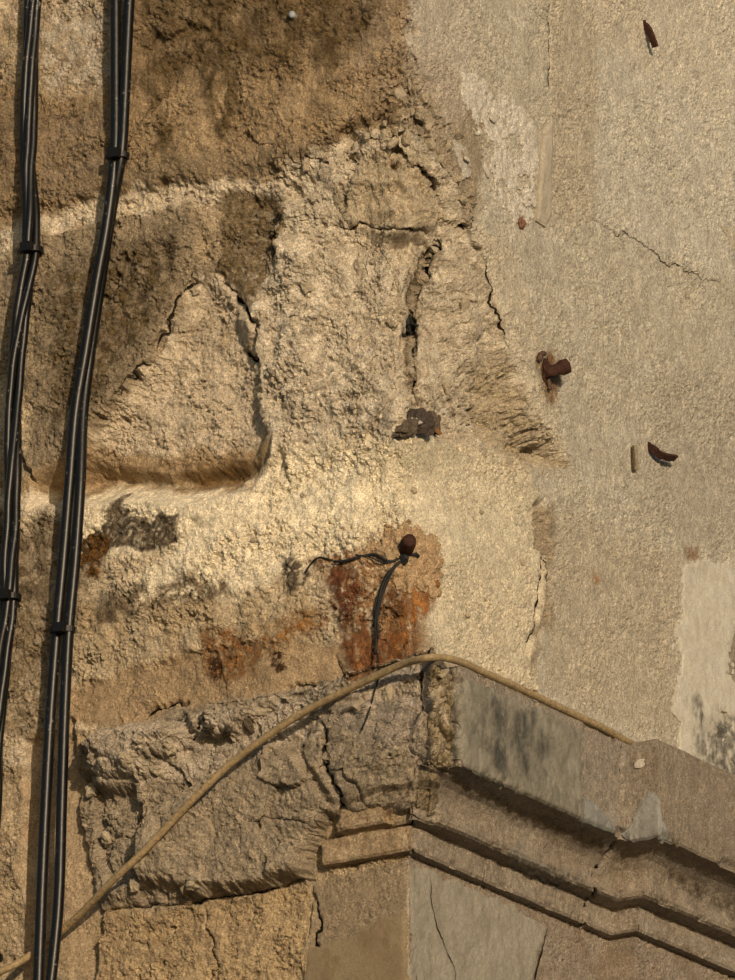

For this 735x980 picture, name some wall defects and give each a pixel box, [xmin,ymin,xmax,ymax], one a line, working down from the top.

corrosion [643,20,658,48]
crack [112,269,197,402]
crack [224,277,259,362]
spalling [86,56,571,495]
crack [484,259,510,350]
spalling [26,455,66,504]
corrosion [648,442,678,462]
corrosion [201,611,324,681]
corrosion [313,534,434,681]
peeling [671,554,735,774]
crack [322,728,345,806]
spalling [80,665,672,914]